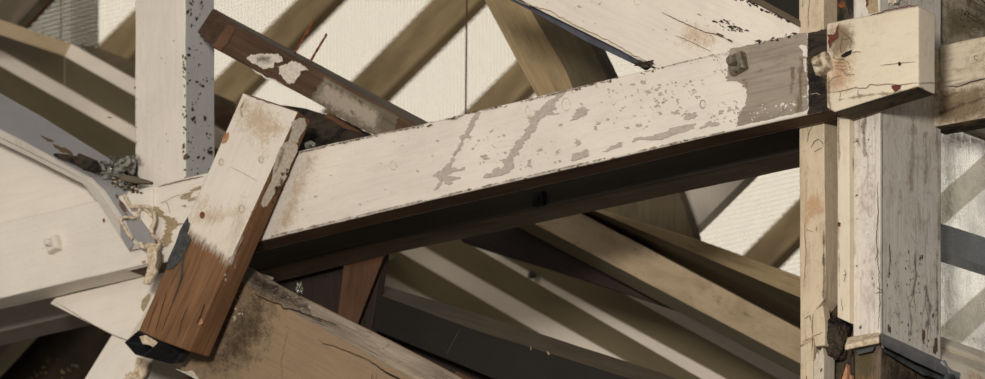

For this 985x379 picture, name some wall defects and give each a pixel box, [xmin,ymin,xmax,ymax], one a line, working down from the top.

peeling [247,53,308,86]
peeling [433,0,809,190]
crack [254,293,400,379]